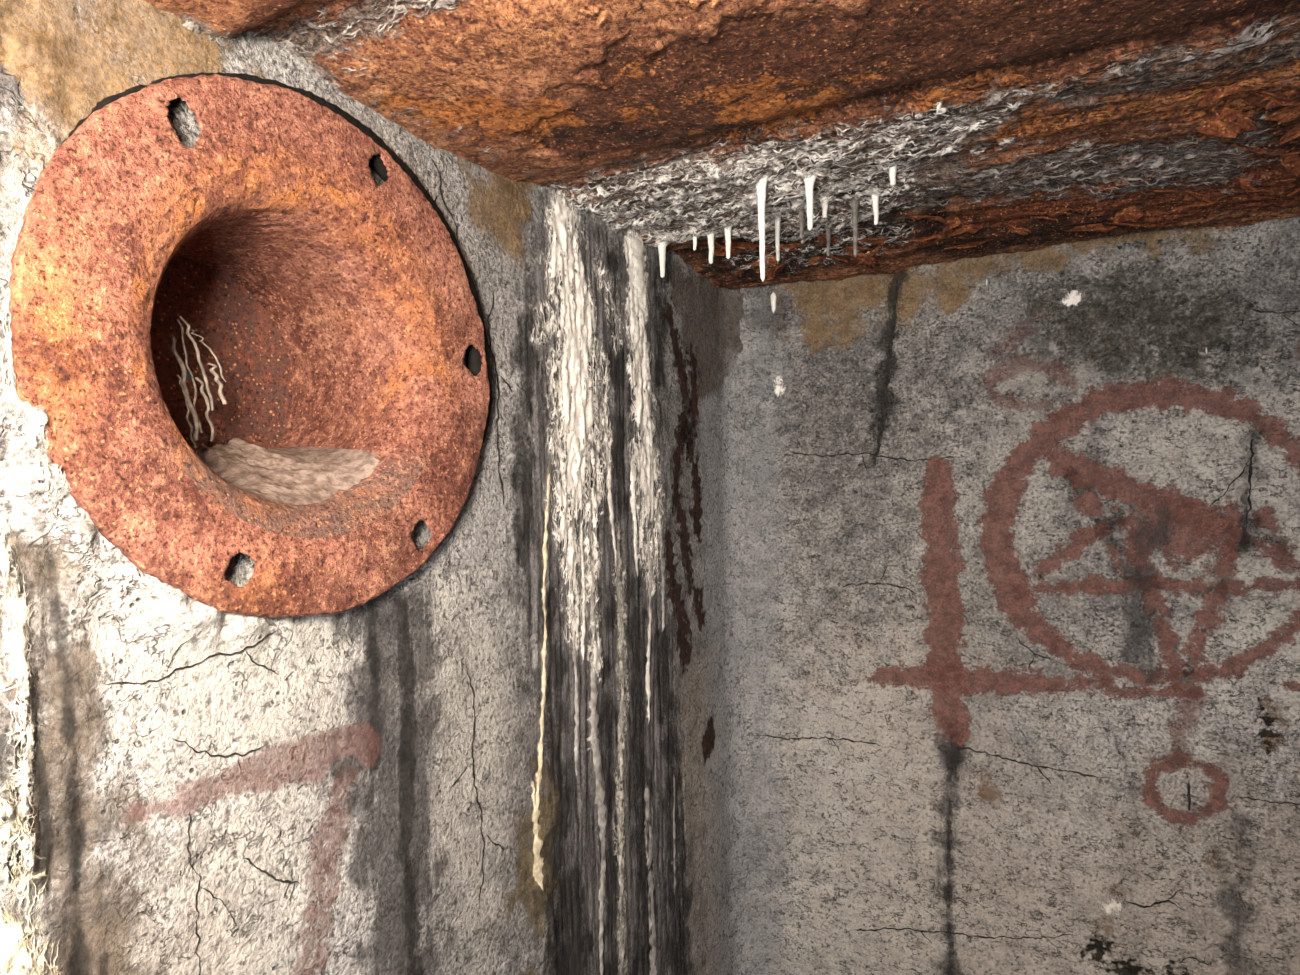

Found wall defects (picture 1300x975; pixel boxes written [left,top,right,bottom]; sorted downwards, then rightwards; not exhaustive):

rust [577,6,613,27]
rust [673,0,721,10]
rust [1146,81,1300,208]
rust [700,231,888,280]
rust [898,216,991,250]
rust [1007,205,1144,235]
rust [662,296,706,674]
leakage [469,15,1300,975]
crack [1210,440,1254,530]
crack [106,630,279,685]
leakage [332,589,445,975]